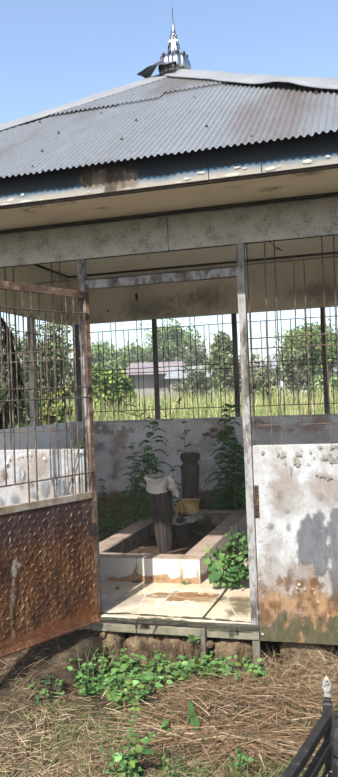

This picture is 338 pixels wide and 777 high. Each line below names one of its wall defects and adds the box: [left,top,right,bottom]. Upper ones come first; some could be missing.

leakage [80,163,137,192]